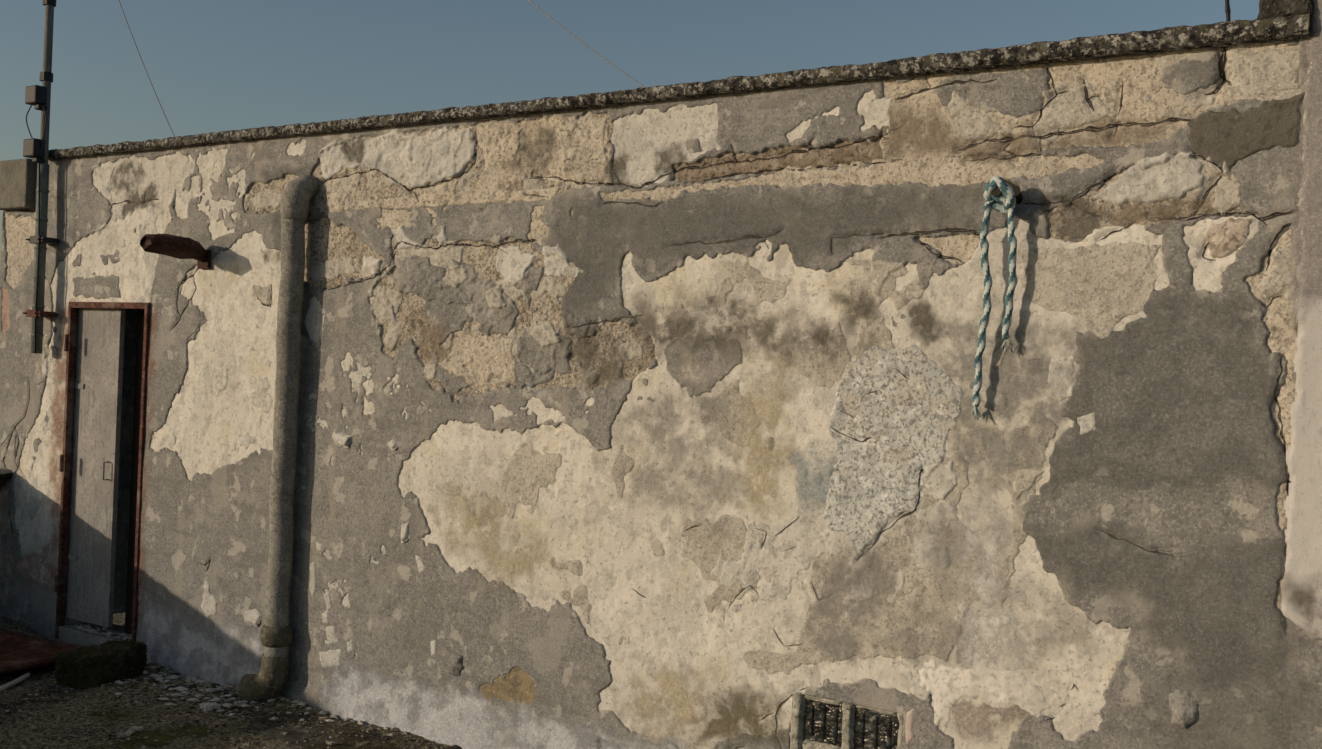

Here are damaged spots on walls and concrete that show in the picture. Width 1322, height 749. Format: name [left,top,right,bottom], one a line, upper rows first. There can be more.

flaking render [2,212,35,334]
flaking render [8,147,298,589]
flaking render [283,41,1307,749]
crack [958,47,1297,308]
crack [1273,358,1290,494]
flaking render [201,578,217,619]
flaking render [244,609,261,627]
water stain [230,542,681,749]